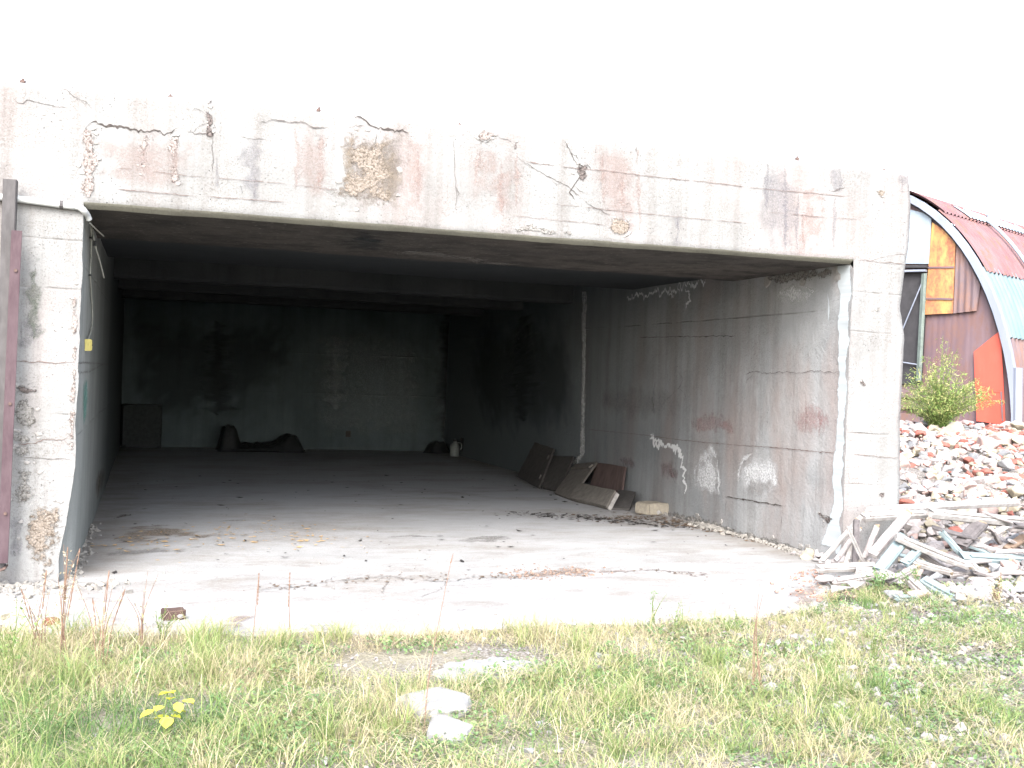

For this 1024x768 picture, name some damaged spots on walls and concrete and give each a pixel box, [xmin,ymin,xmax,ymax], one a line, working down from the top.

crack [15,88,206,141]
spalling [200,100,216,152]
crack [245,116,408,153]
spalling [76,127,102,197]
spalling [333,126,403,211]
crack [518,141,844,225]
spalling [611,217,631,238]
spalling [11,384,64,578]
water stain [738,454,777,486]
crack [725,496,782,530]